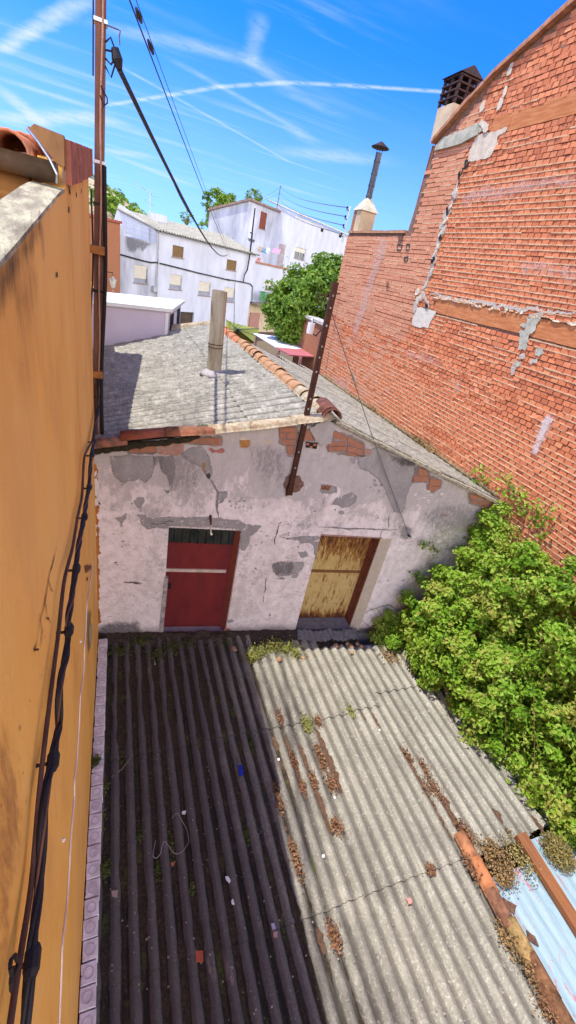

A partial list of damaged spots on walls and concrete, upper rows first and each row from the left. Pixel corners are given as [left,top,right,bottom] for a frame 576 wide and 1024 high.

crack [413,168,575,315]
flaking render [110,435,223,493]
crack [202,462,227,518]
flaking render [278,425,444,515]
flaking render [467,492,499,511]
damp [533,416,552,454]
flaking render [116,491,320,585]